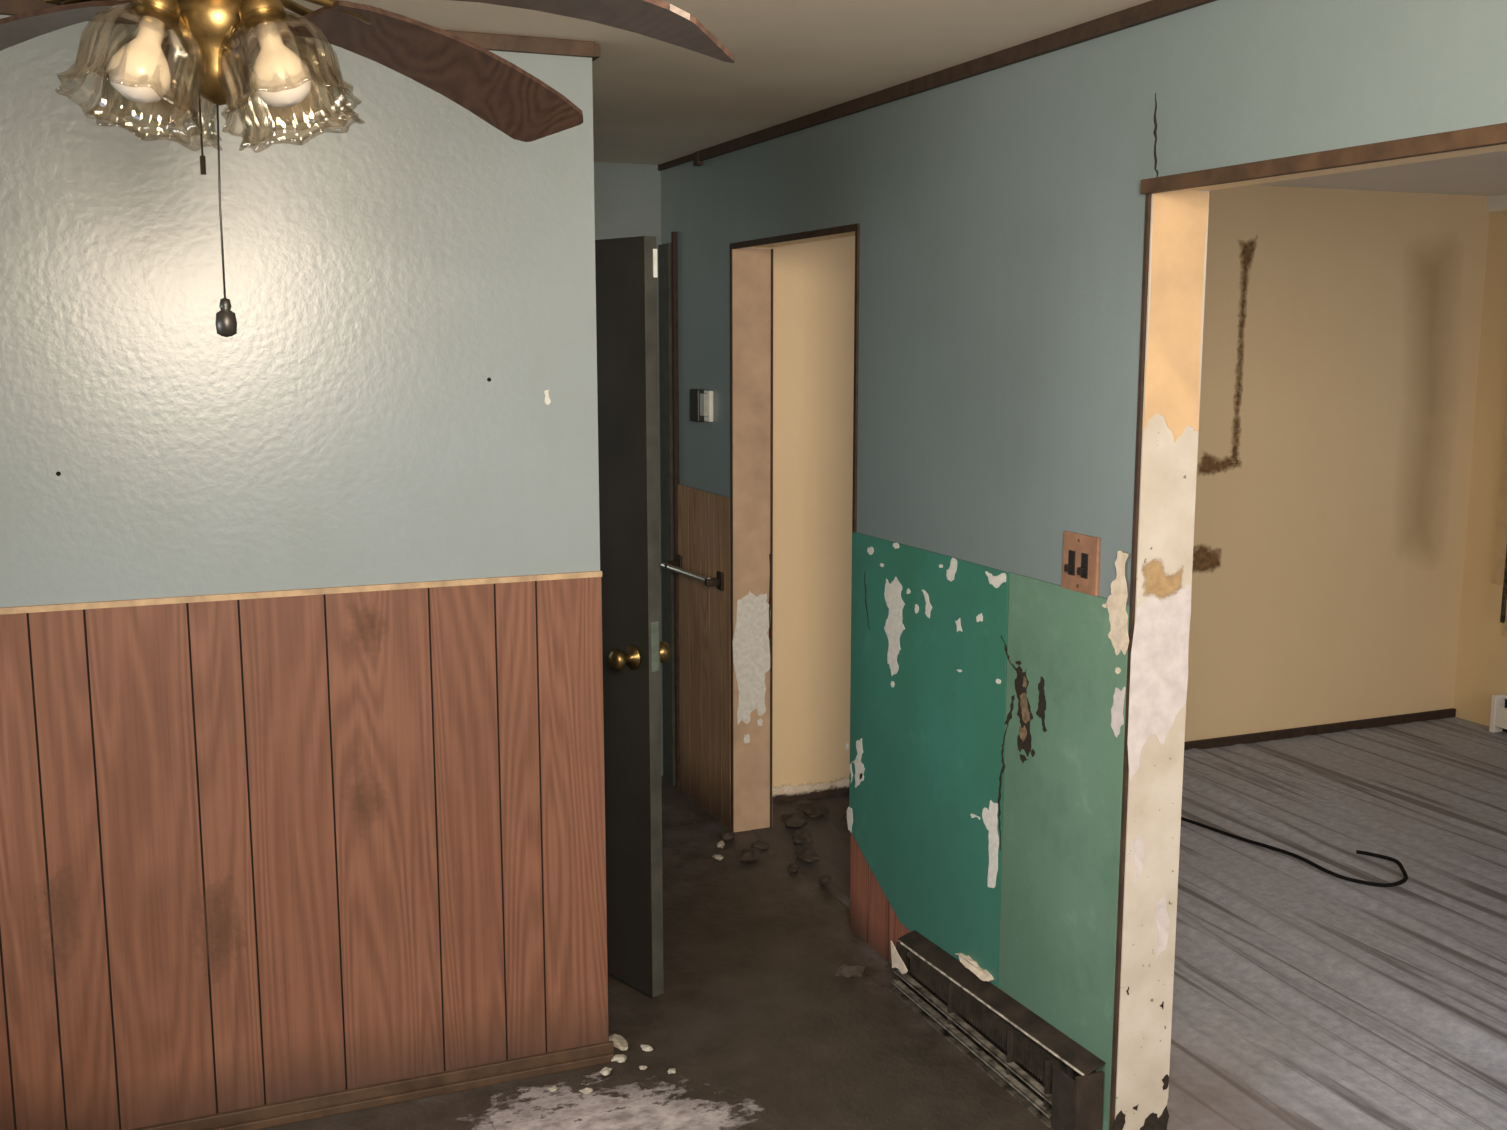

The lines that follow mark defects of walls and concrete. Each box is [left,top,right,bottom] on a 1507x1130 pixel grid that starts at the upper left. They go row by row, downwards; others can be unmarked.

peeling [867,547,932,687]
peeling [939,557,957,581]
peeling [985,571,1006,588]
peeling [733,592,770,744]
peeling [1102,551,1192,784]
crack [998,725,1008,851]
peeling [970,800,999,888]
water stain [456,1072,764,1130]
spalling [1114,1074,1169,1130]